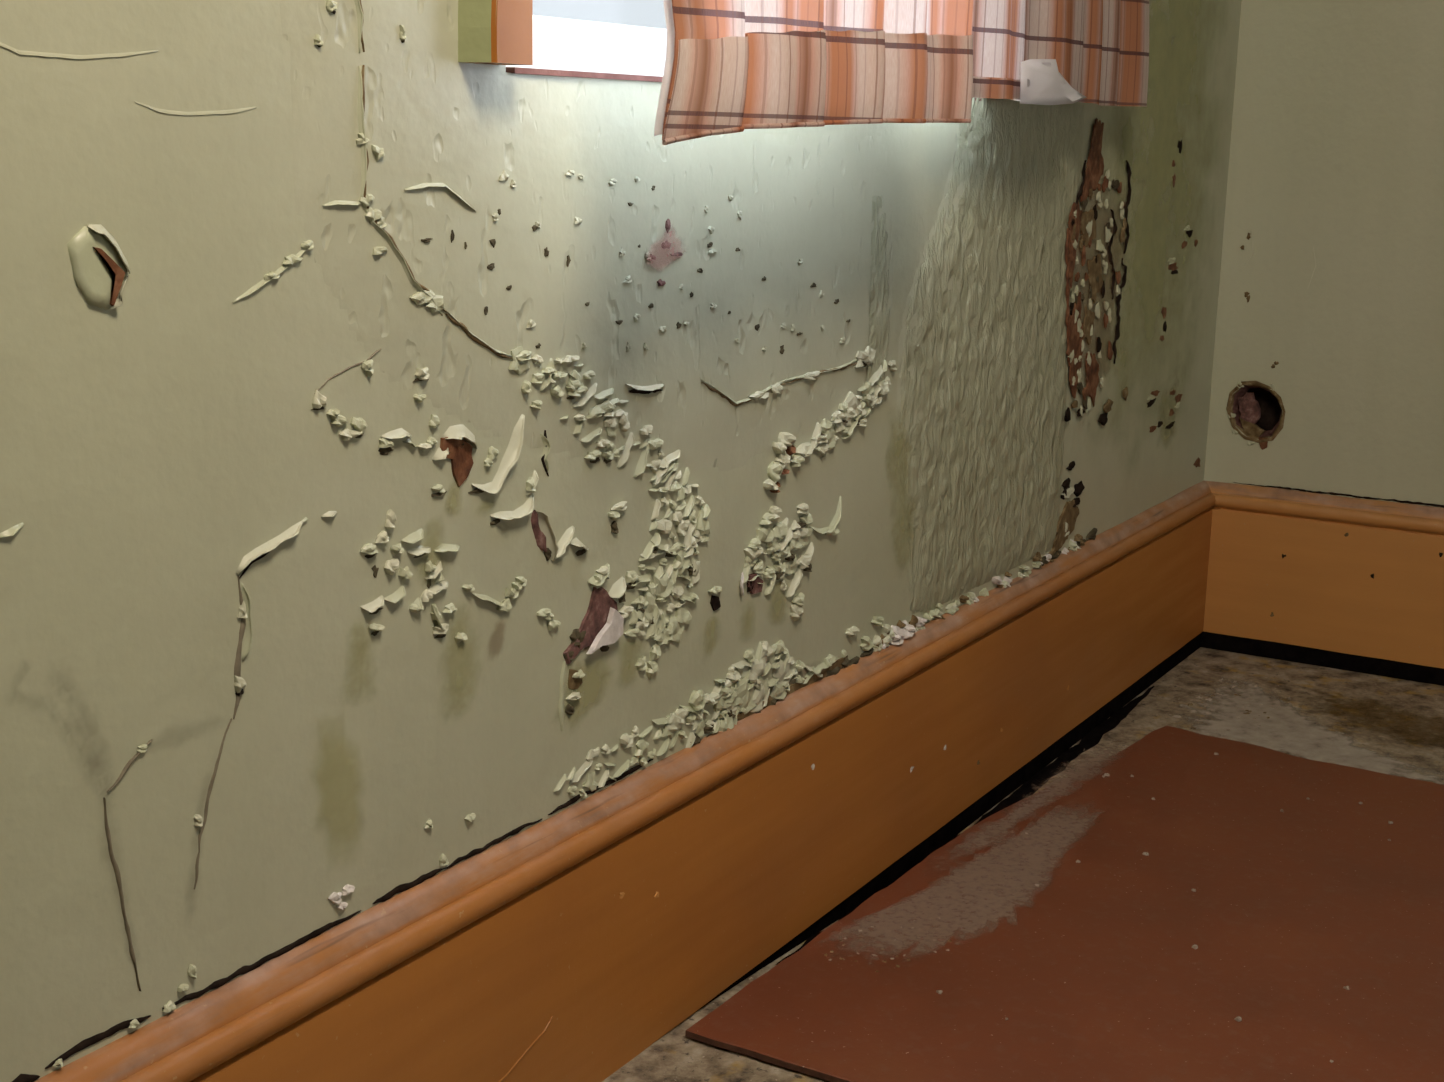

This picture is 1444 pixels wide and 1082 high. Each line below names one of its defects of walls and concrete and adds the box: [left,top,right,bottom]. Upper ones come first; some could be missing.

spalling [404,183,476,211]
spalling [697,206,717,273]
peeling [1168,225,1198,274]
spalling [762,323,802,354]
peeling [1159,306,1167,341]
peeling [1147,389,1183,433]
spalling [1226,361,1285,450]
peeling [739,360,897,621]
peeling [311,319,722,731]
flaking render [554,528,1098,799]
crack [193,511,337,889]